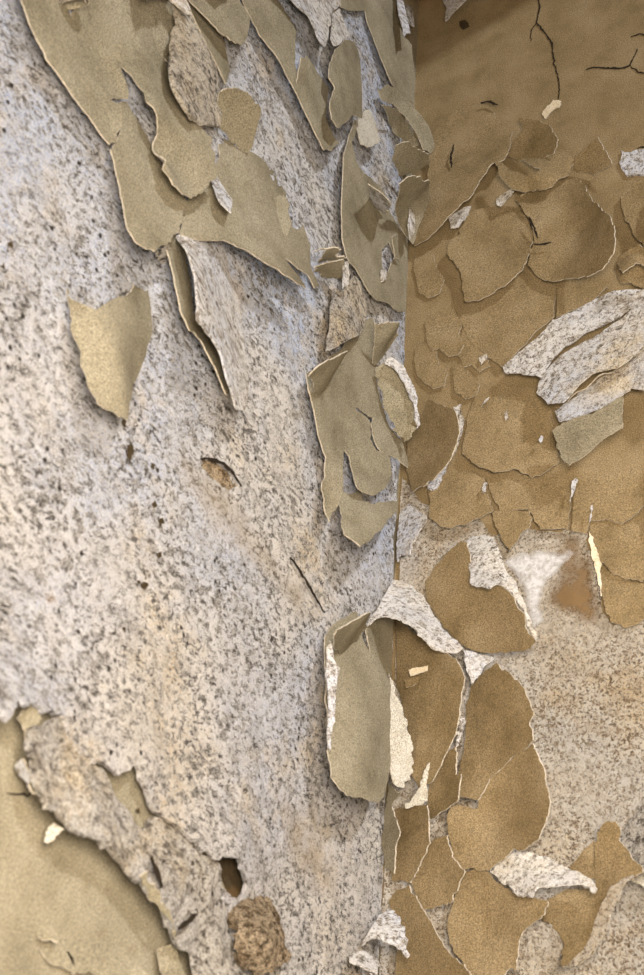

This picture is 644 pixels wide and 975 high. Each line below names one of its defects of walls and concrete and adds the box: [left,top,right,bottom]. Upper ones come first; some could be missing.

peeling [291,0,616,302]
crack [530,0,560,100]
crack [586,33,644,74]
peeling [619,149,644,245]
spalling [0,0,431,975]
spalling [365,245,644,975]